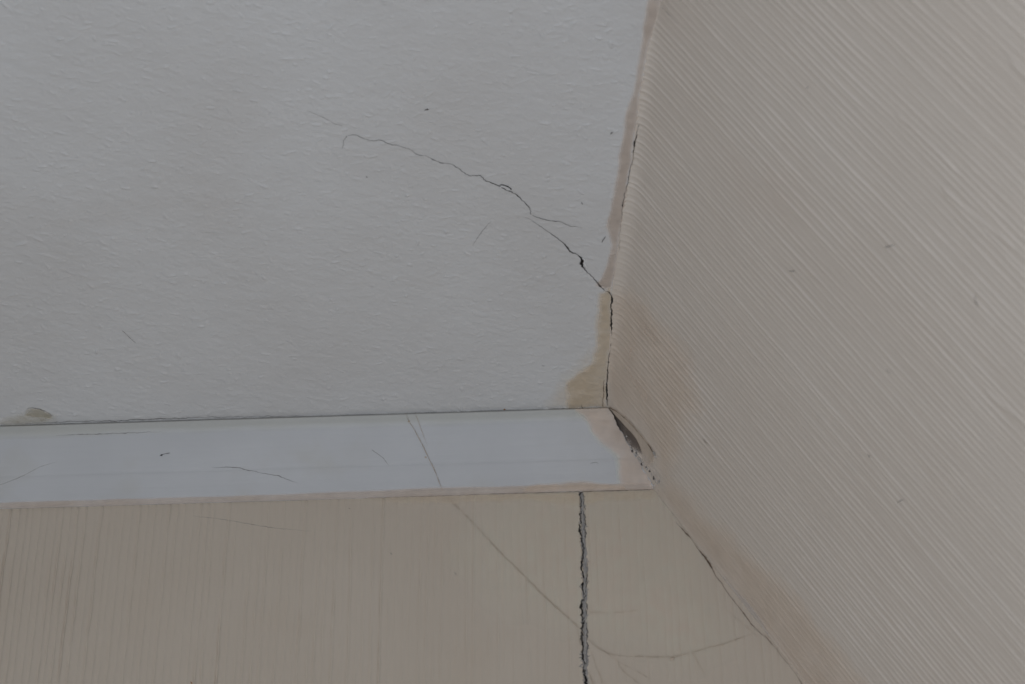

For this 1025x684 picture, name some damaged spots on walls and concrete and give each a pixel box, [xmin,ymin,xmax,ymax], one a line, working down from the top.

crack [416,154,613,409]
crack [475,489,651,684]
crack [681,528,785,660]